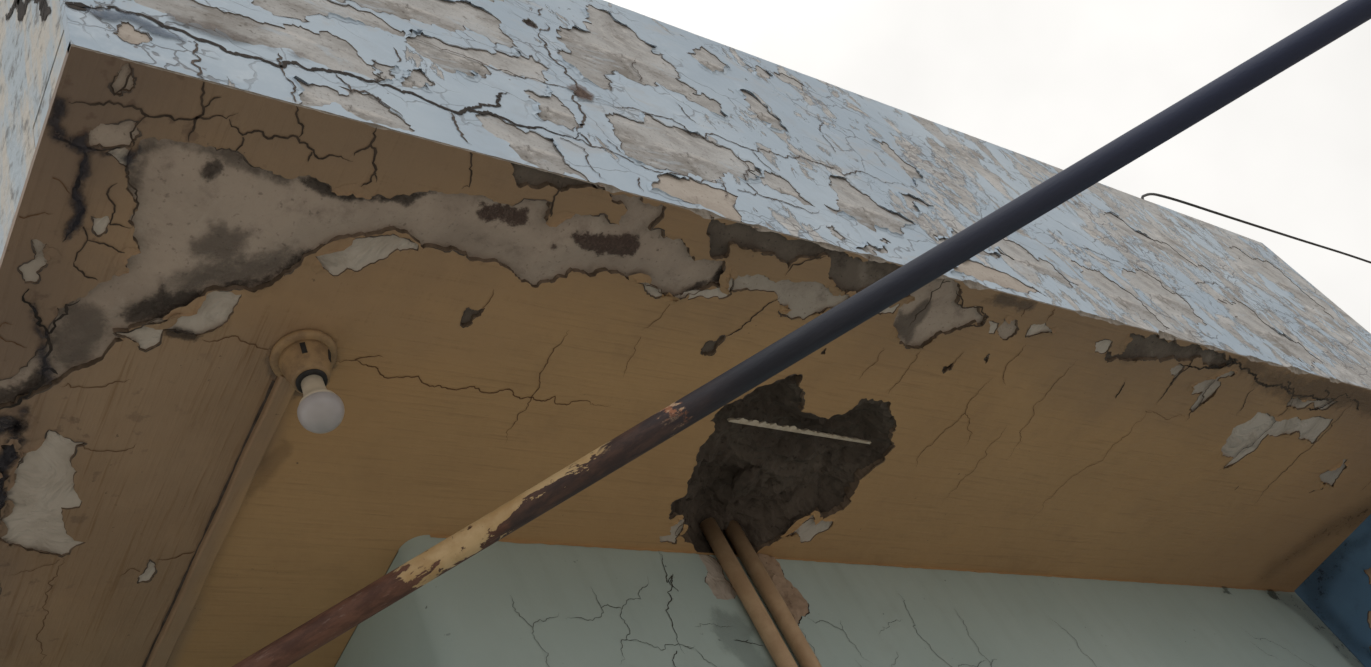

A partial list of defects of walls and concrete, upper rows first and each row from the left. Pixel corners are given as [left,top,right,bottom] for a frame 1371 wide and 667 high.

water stain [47,98,154,240]
water stain [274,174,430,206]
crack [0,0,901,410]
spalling [0,0,935,558]
water stain [476,202,529,227]
water stain [572,231,640,256]
peeling [1104,210,1211,273]
crack [336,304,670,437]
spalling [878,239,1371,470]
spalling [660,374,897,600]
crack [512,554,763,667]
crack [805,600,997,667]